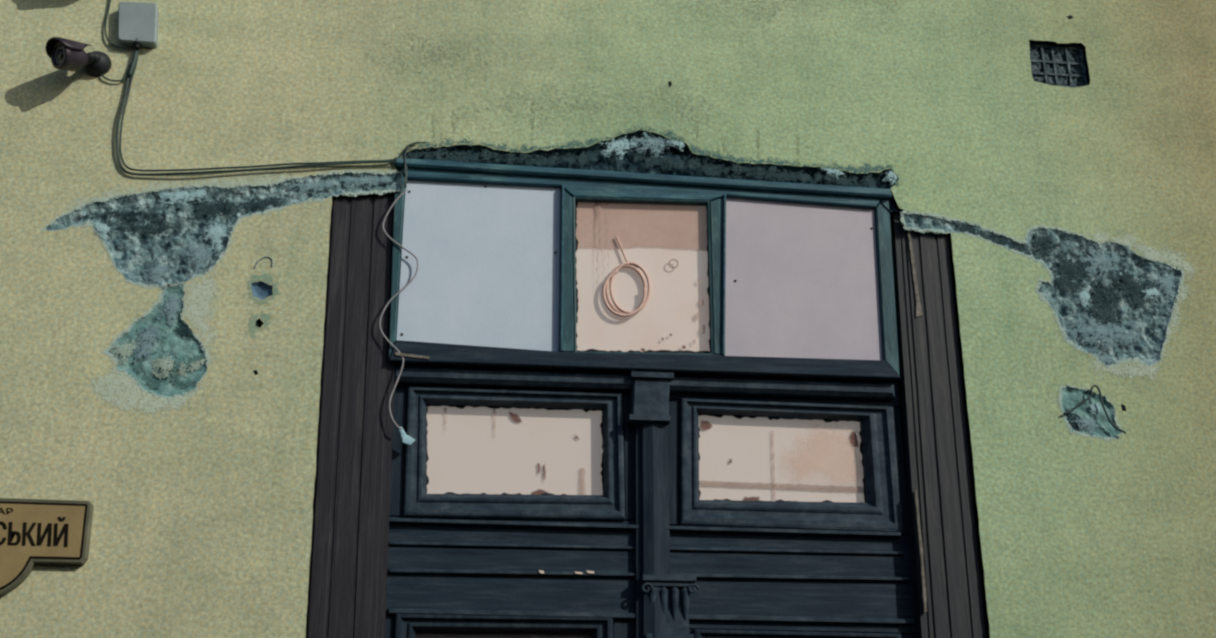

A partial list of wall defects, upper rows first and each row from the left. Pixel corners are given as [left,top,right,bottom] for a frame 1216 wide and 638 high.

spalling [42,124,1196,441]